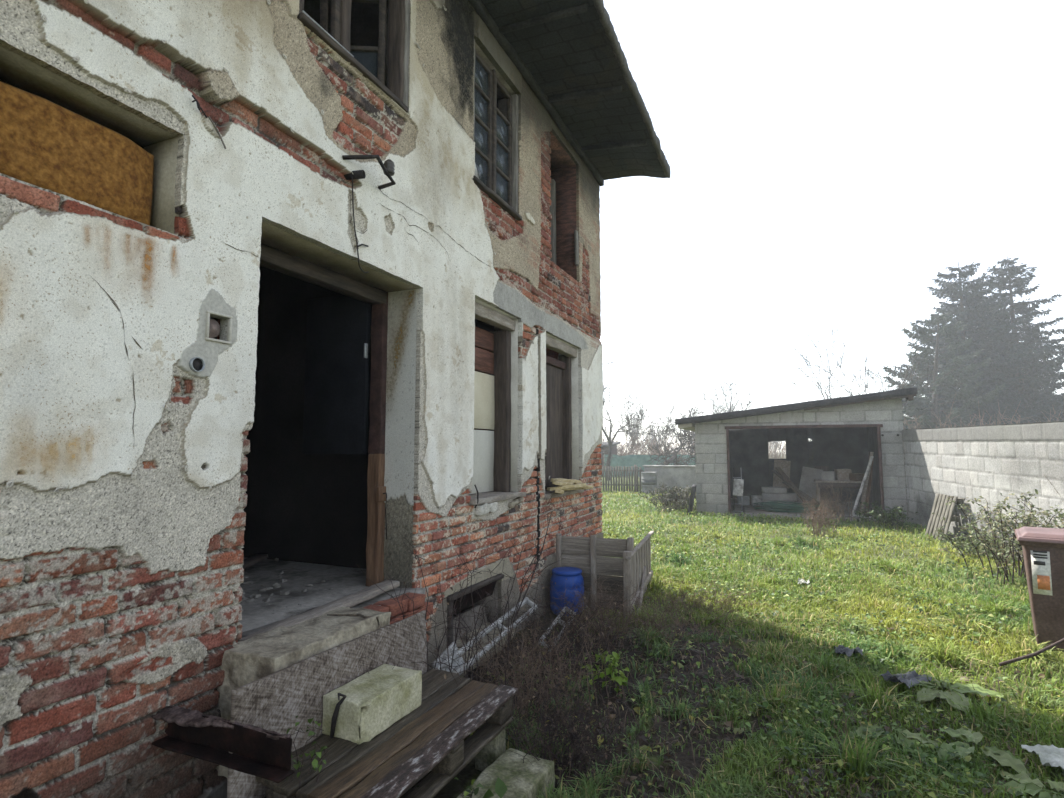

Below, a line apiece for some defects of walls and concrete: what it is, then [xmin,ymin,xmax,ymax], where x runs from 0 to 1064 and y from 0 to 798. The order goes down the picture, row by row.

peeling [0,364,253,798]